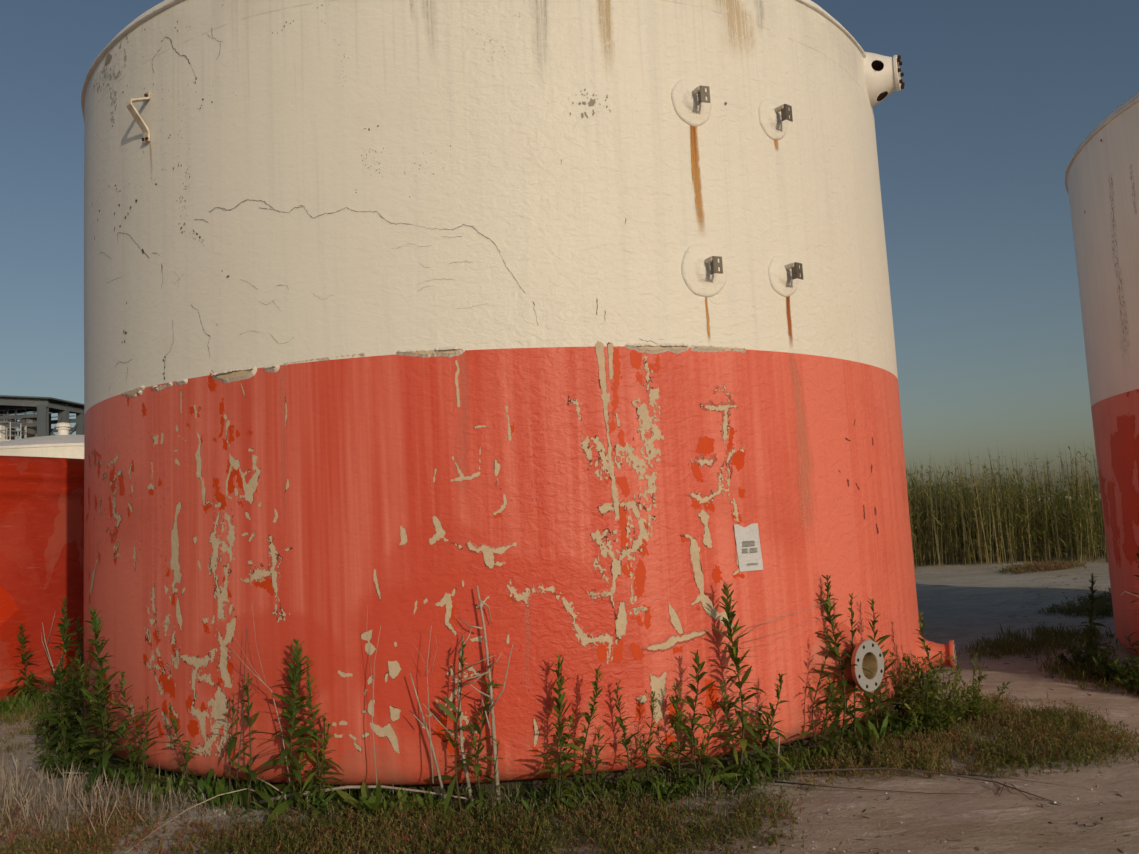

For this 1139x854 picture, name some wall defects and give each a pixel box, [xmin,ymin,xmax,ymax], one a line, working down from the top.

corrosion [690,125,702,223]
crack [194,199,538,323]
peeling [84,356,293,759]
peeling [429,516,517,569]
peeling [450,447,512,519]
peeling [505,341,752,664]
peeling [1099,414,1139,568]
peeling [360,630,376,655]
peeling [414,580,483,644]
peeling [332,661,402,753]
peeling [422,662,484,755]
peeling [635,671,680,750]